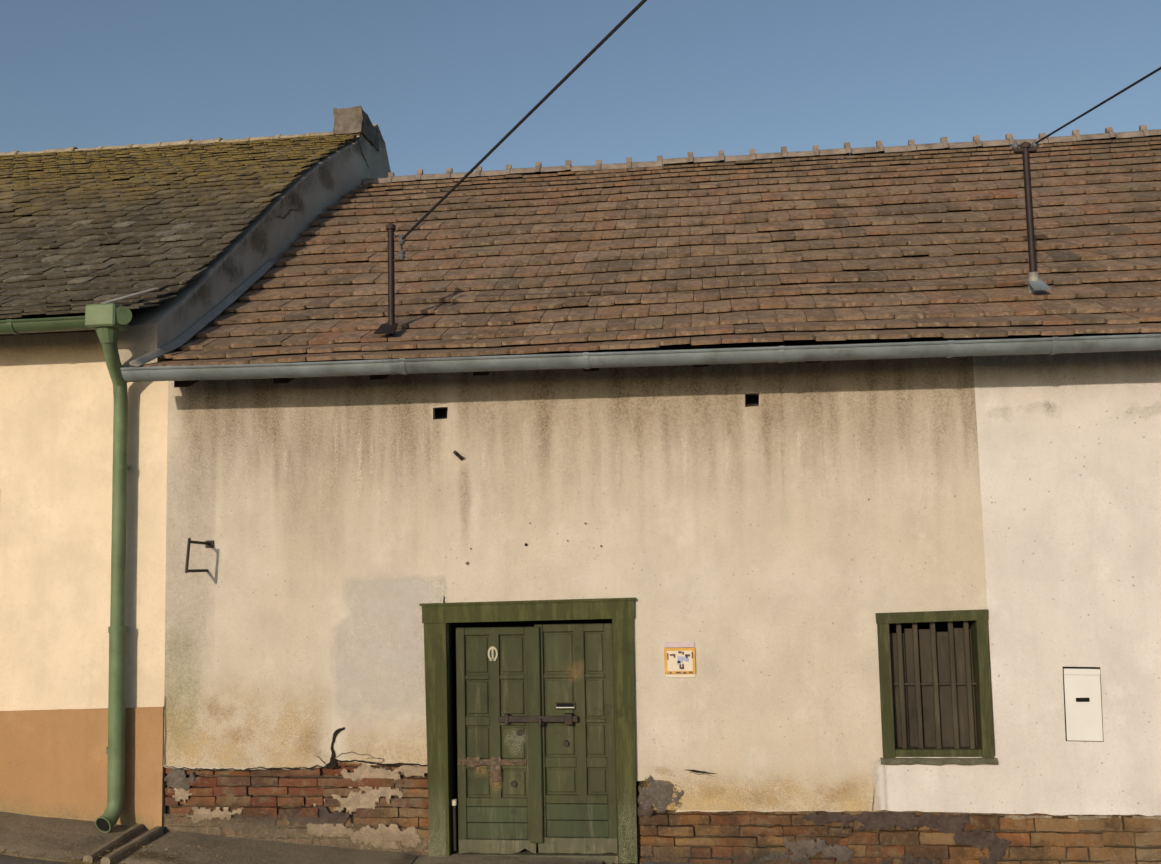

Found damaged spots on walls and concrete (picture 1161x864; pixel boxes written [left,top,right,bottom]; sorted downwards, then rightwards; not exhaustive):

crack [163,699,427,771]
spalling [164,762,446,856]
spalling [619,775,1161,863]